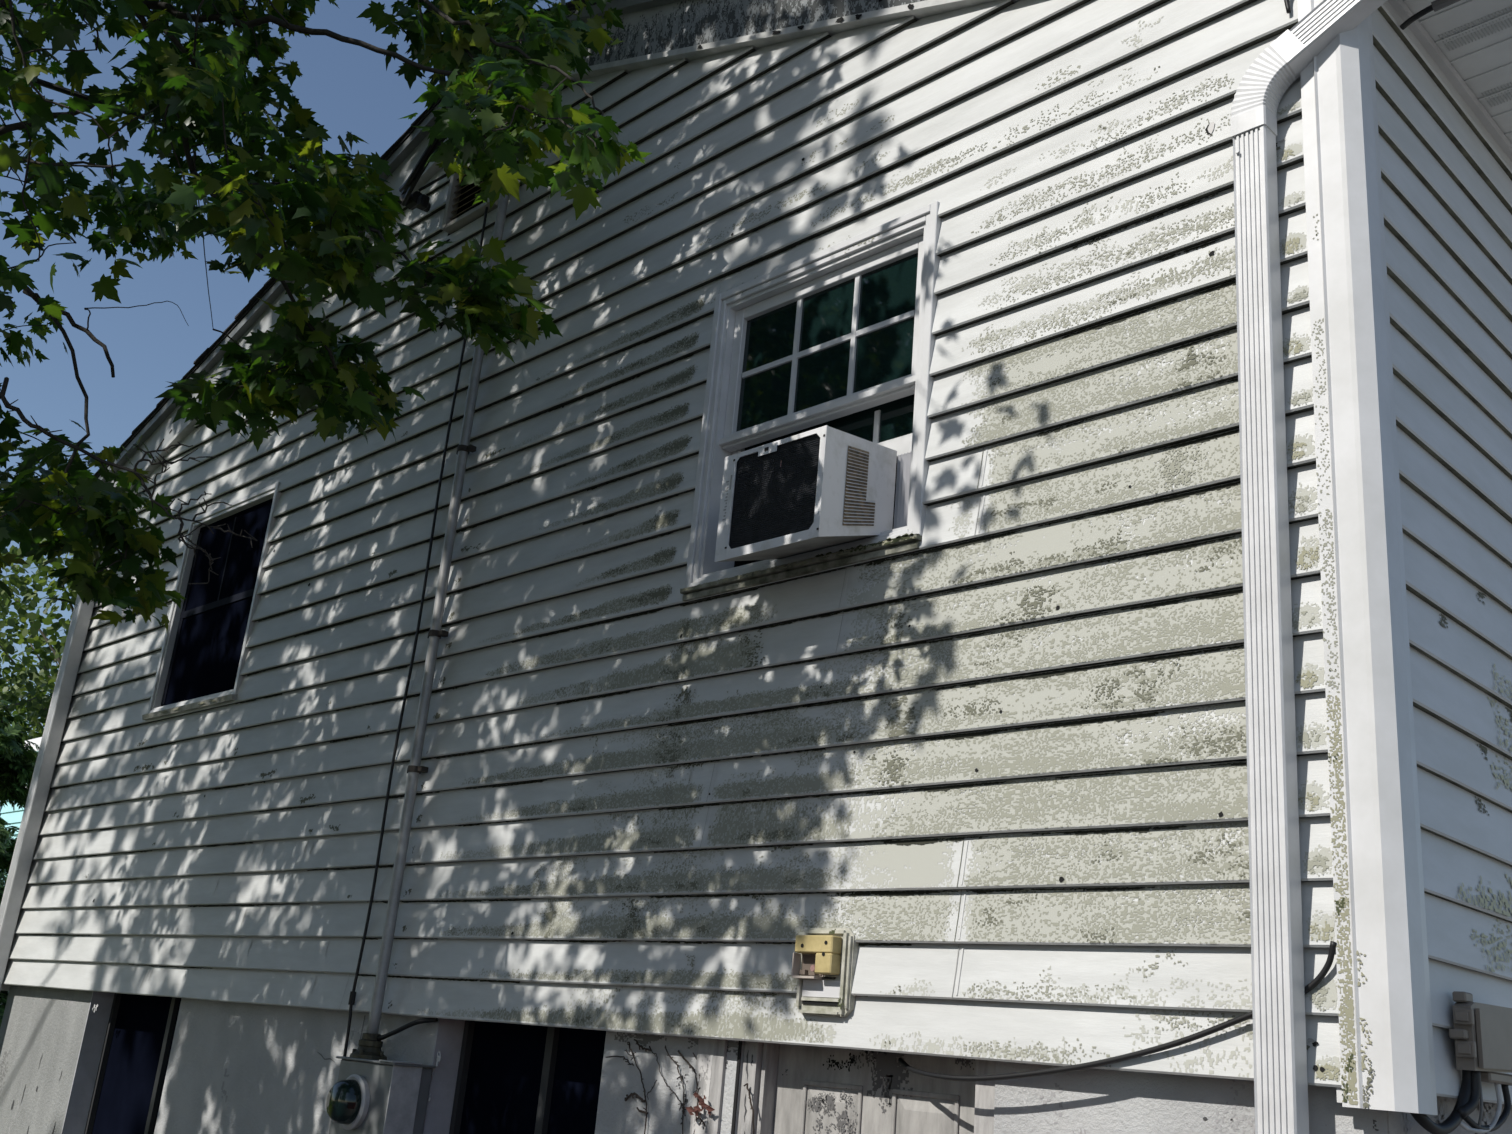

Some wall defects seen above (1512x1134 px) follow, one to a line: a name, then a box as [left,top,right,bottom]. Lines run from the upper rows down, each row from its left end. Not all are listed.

damp [1172,346,1225,390]
damp [978,450,1057,533]
damp [1149,445,1202,494]
damp [1180,534,1242,572]
damp [948,530,1127,666]
damp [655,620,703,801]
damp [862,612,923,786]
damp [944,699,1001,718]
damp [1080,657,1181,712]
damp [1283,318,1375,1108]
damp [531,862,556,938]
damp [956,840,1037,995]